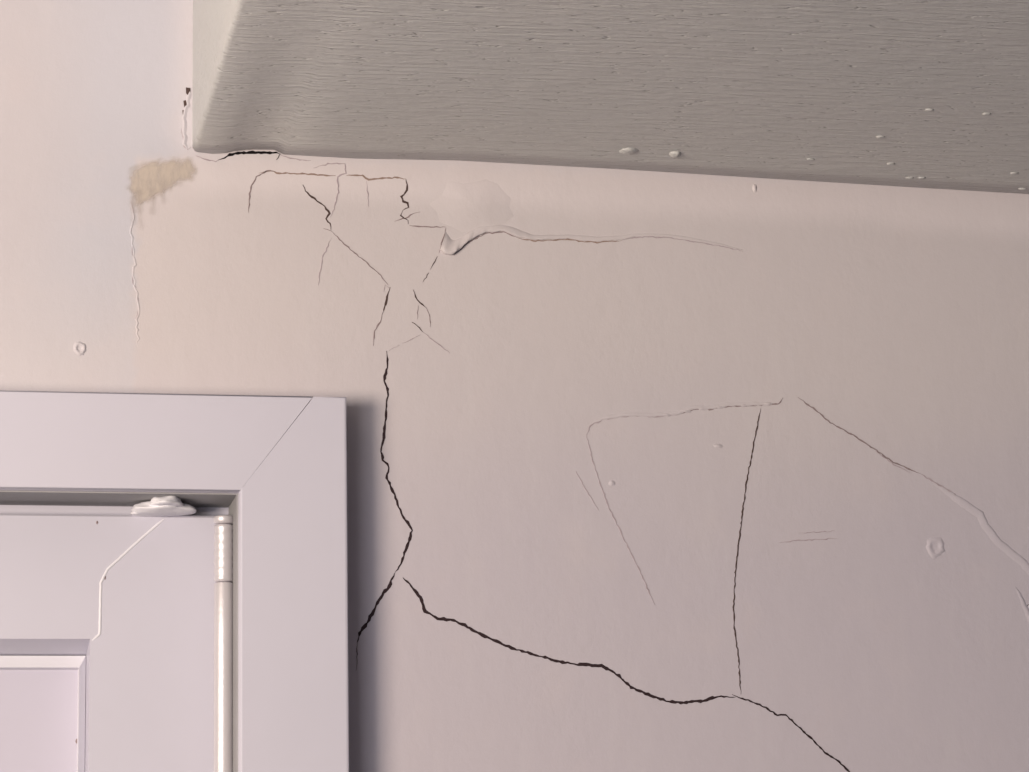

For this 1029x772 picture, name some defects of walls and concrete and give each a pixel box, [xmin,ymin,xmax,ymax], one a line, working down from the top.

crack [197,150,956,772]